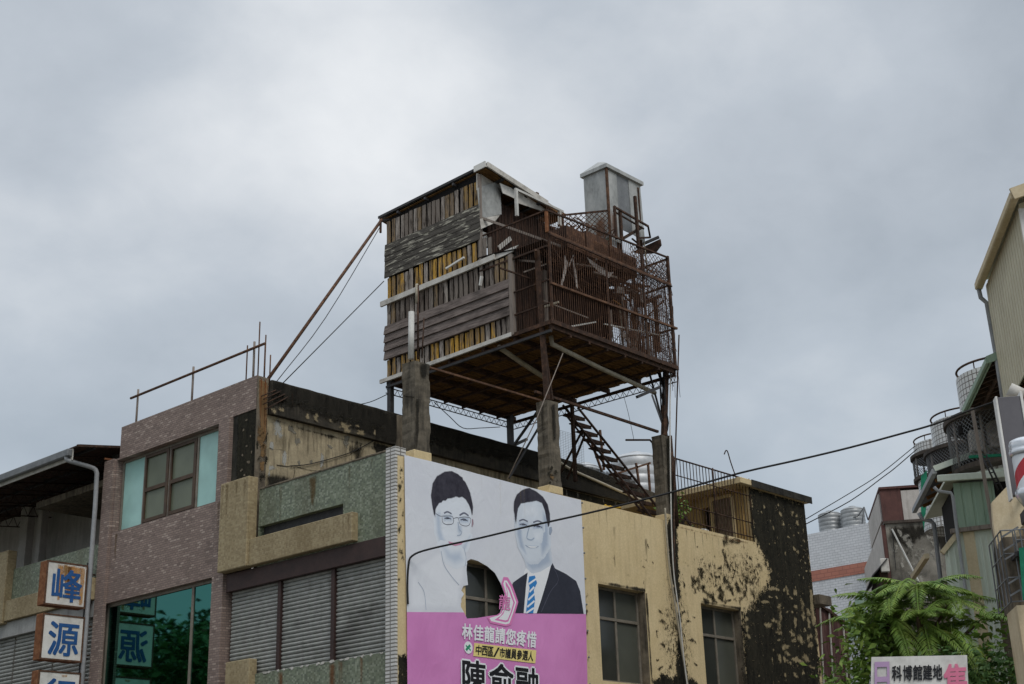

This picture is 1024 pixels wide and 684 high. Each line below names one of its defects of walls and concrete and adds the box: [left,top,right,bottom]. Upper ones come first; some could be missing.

damp [236,381,398,479]
flaking render [305,413,376,435]
damp [416,399,538,469]
damp [268,476,289,485]
mould [738,489,823,684]